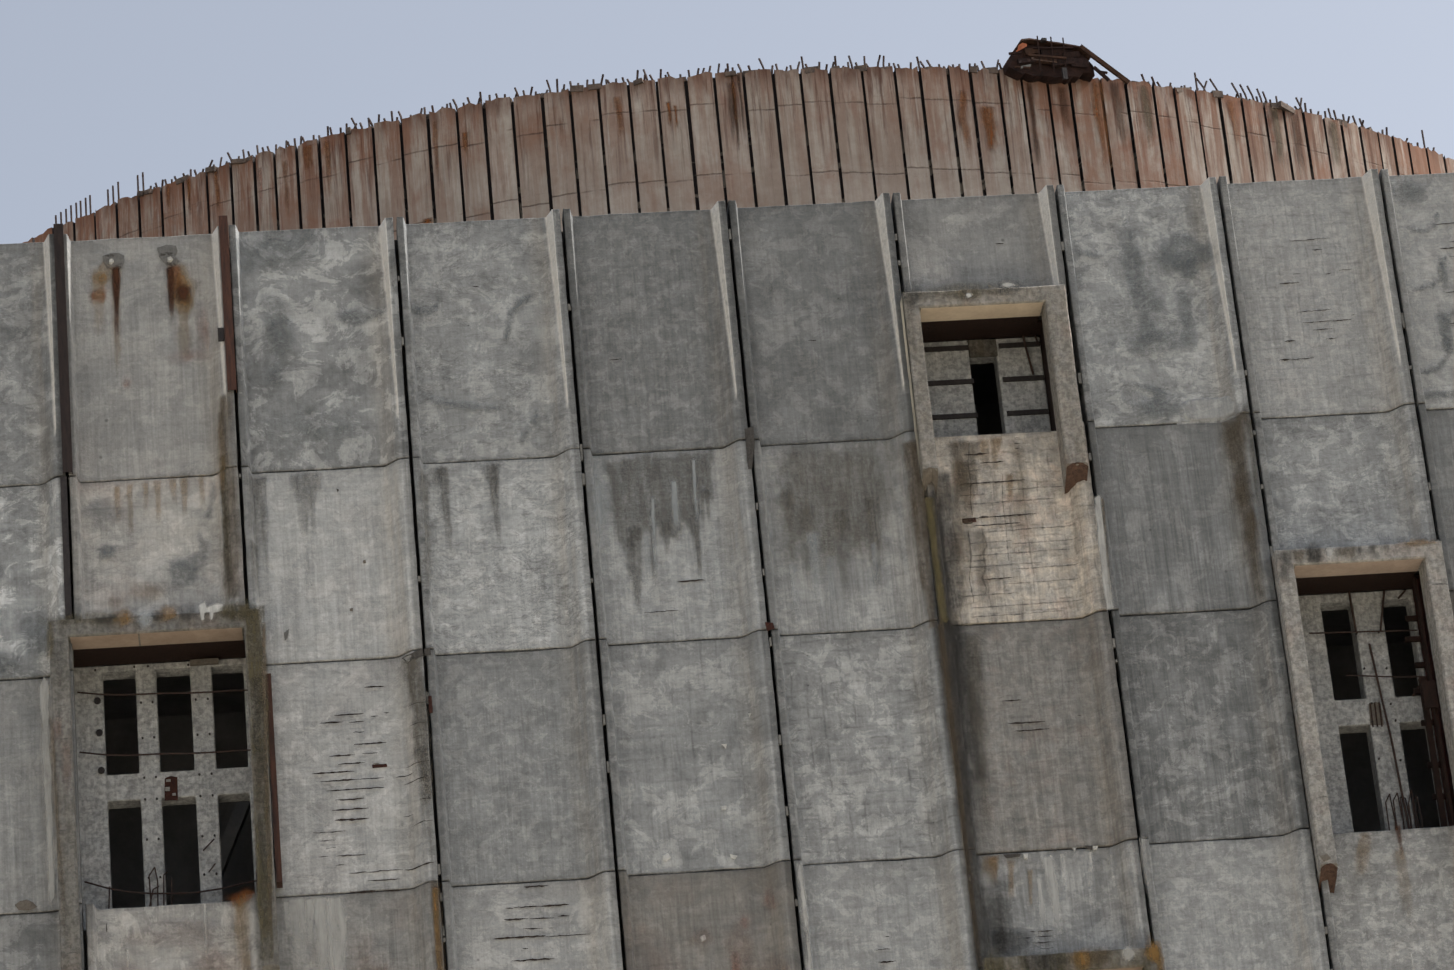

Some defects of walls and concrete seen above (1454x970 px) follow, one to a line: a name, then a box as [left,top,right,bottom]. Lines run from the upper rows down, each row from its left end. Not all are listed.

rust [91,268,120,330]
rust [167,267,192,313]
water stain [596,455,710,590]
efflorescence [1095,497,1113,609]